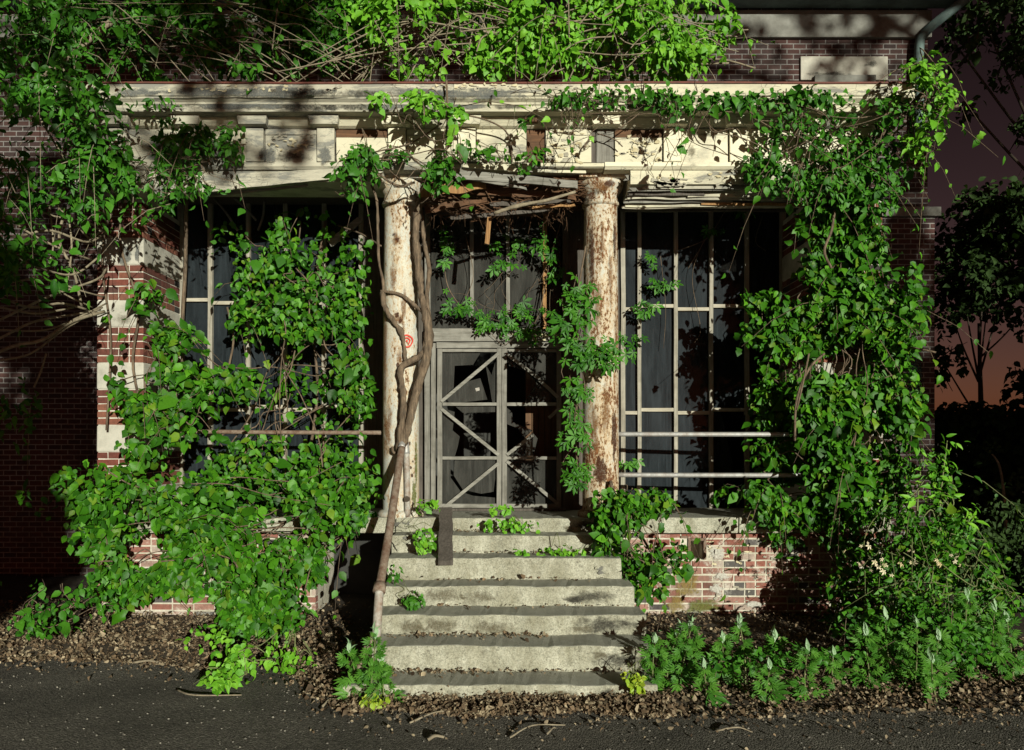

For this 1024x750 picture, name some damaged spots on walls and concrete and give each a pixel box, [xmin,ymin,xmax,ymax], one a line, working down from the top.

peeling [431,82,522,91]
peeling [548,131,590,164]
peeling [615,135,660,161]
corrosion [588,180,615,199]
corrosion [590,220,616,319]
corrosion [592,396,616,486]
leakage [710,573,728,595]